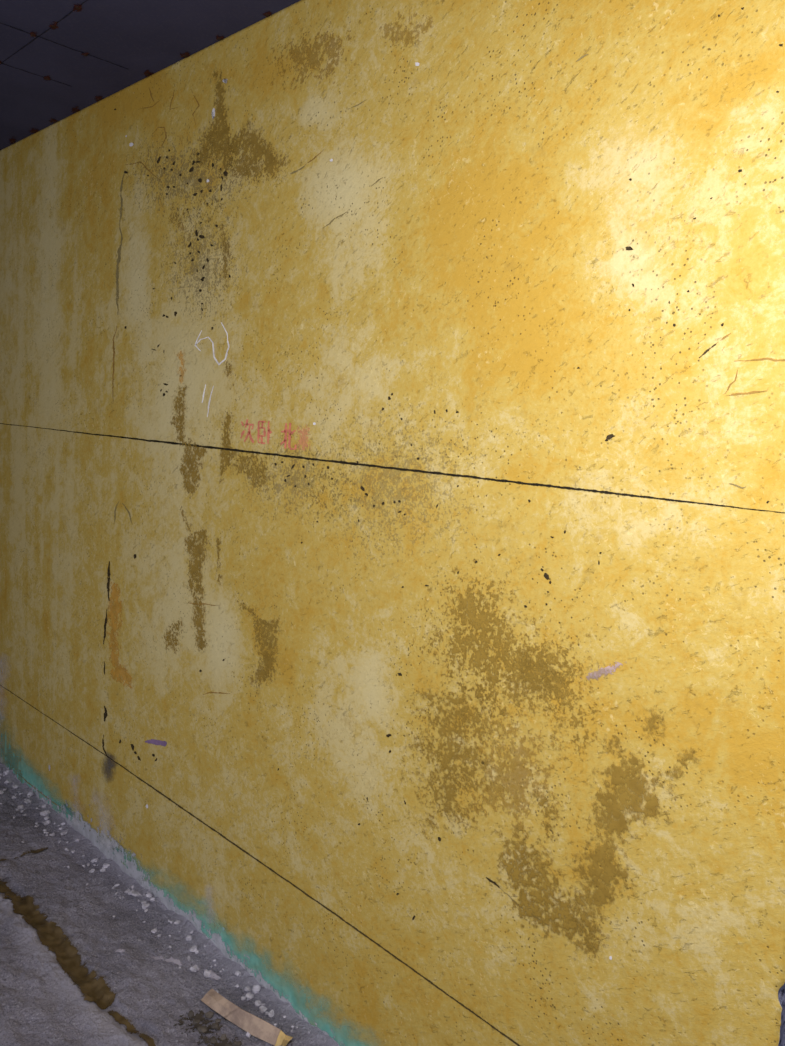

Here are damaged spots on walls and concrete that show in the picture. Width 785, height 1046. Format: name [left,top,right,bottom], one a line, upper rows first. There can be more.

damp [196,72,286,181]
crack [112,88,199,392]
damp [170,387,207,494]
damp [219,412,269,487]
crack [102,561,110,674]
damp [164,510,221,653]
damp [237,601,278,686]
crack [100,706,108,755]
damp [410,568,697,957]